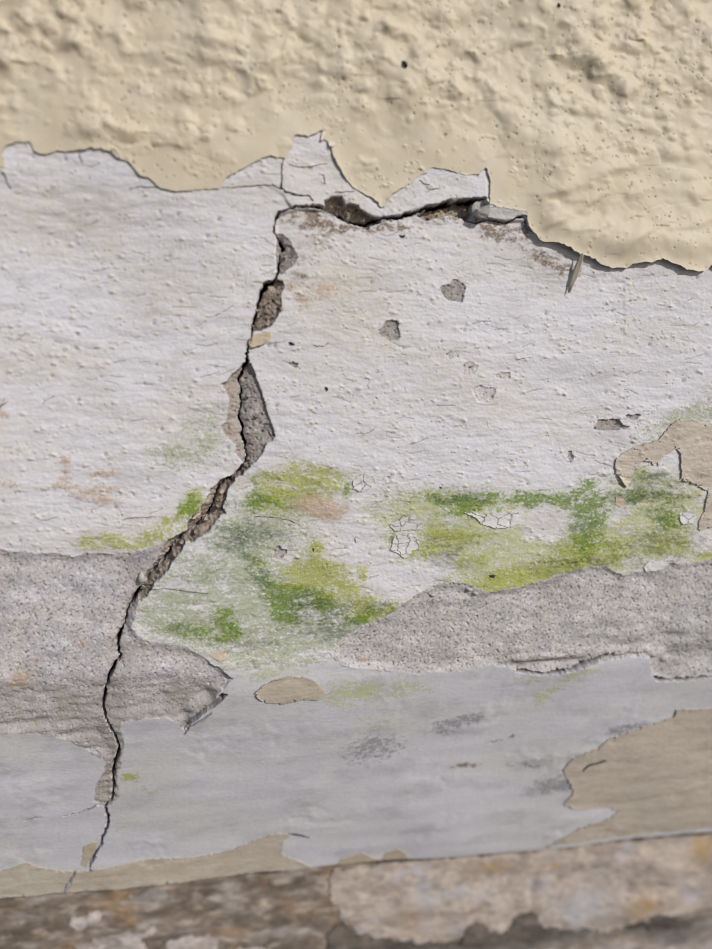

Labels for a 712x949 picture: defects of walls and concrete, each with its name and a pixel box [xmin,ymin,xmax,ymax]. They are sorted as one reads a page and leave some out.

crack [22,158,528,892]
peeling [0,121,712,805]